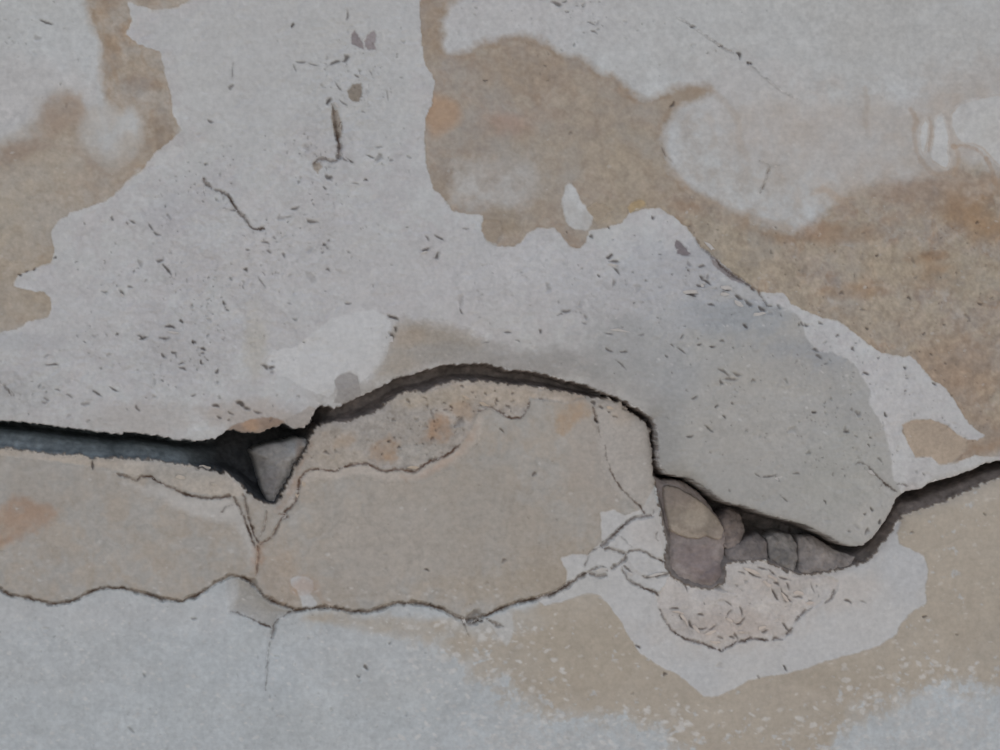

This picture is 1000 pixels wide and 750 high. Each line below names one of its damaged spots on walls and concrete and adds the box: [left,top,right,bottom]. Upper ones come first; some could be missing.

water stain [0,0,187,331]
flaking render [0,0,1000,506]
water stain [420,0,1000,463]
spalling [0,449,259,570]
flaking render [0,578,318,648]
crack [0,362,1000,691]
flaking render [535,400,929,698]